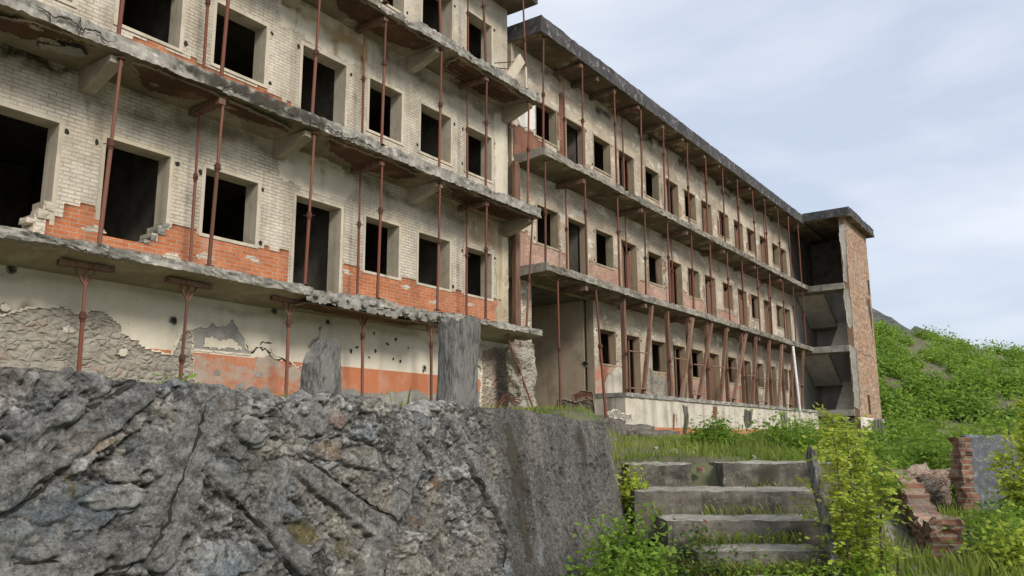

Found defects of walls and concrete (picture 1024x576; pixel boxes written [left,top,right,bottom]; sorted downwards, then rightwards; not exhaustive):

flaking render [18,201,289,282]
peeling [0,302,301,396]
crack [245,340,302,369]
peeling [342,388,436,407]
flaking render [293,263,504,358]
peeling [478,346,509,408]